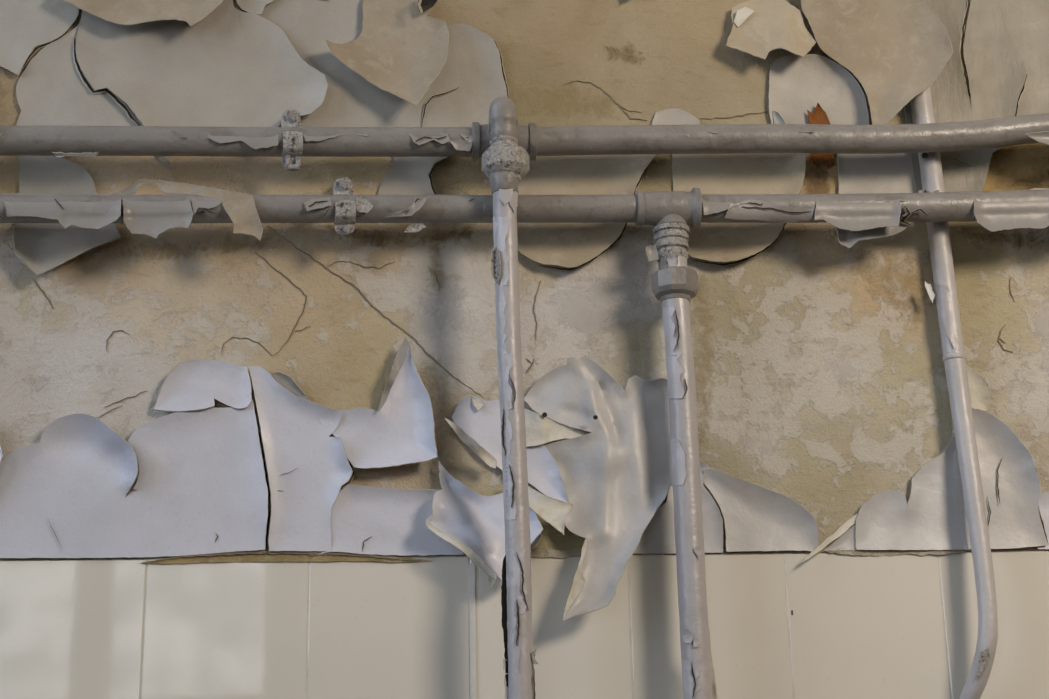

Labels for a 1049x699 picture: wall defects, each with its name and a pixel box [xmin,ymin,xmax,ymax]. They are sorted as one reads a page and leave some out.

peeling [0,0,509,233]
peeling [652,108,700,125]
peeling [726,0,1049,125]
peeling [1025,131,1049,145]
crack [303,200,328,210]
peeling [645,147,1049,267]
crack [221,252,310,355]
peeling [0,152,687,699]
crack [268,226,541,508]
peeling [700,422,971,563]
peeling [972,409,1049,550]